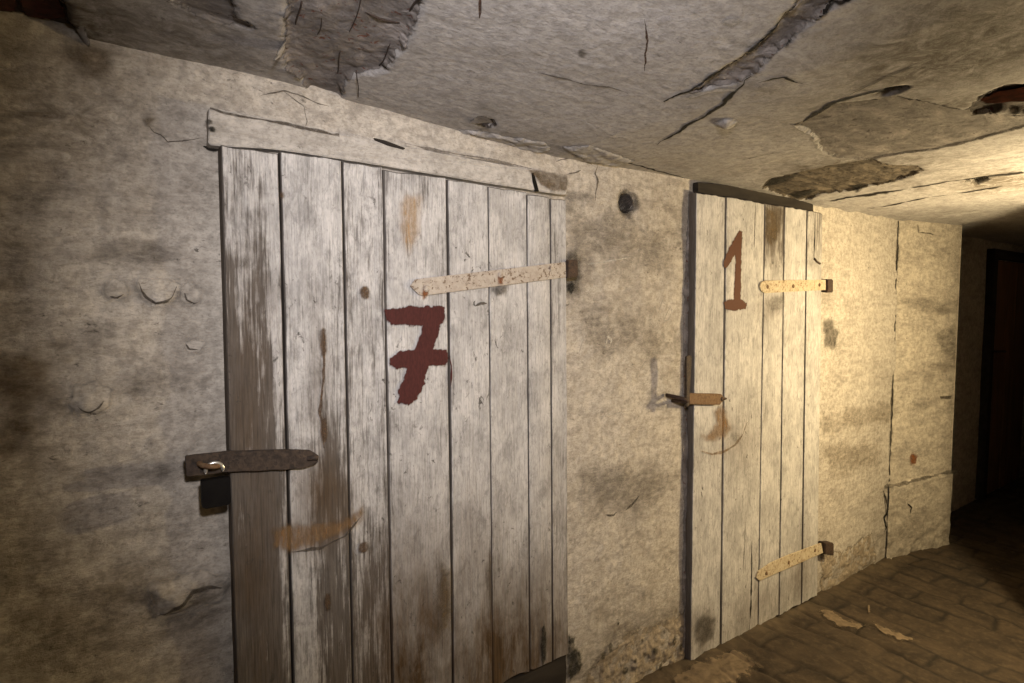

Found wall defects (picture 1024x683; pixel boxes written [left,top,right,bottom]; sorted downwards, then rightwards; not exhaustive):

flaking render [274,0,422,97]
crack [537,72,628,94]
crack [658,5,802,144]
flaking render [689,0,851,99]
crack [803,65,918,122]
flaking render [762,84,1024,200]
damp [824,322,838,346]
crack [883,374,957,528]